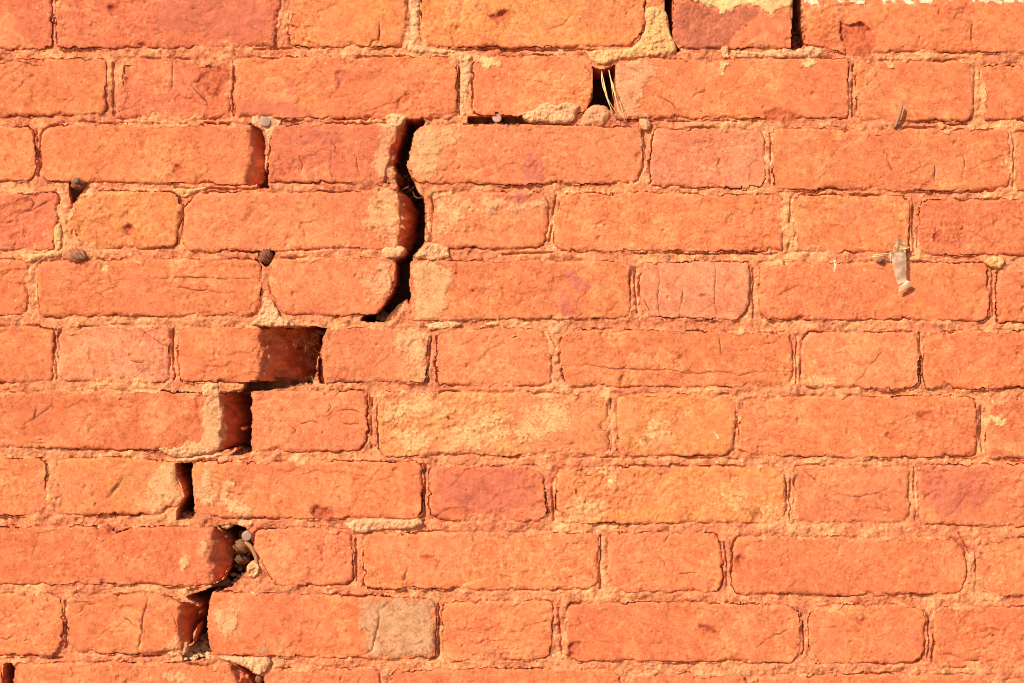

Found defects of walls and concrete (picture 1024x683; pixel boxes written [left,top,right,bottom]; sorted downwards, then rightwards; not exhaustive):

crack [590,76,612,110]
crack [468,115,529,127]
crack [366,126,426,322]
crack [161,276,251,298]
crack [242,327,327,394]
crack [290,405,359,433]
crack [206,525,254,595]